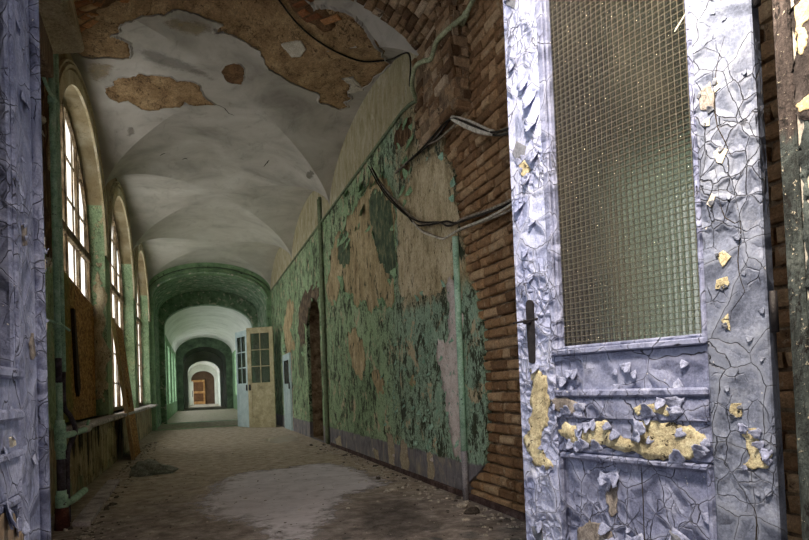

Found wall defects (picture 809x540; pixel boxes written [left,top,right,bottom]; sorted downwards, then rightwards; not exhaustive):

spalling [71,0,392,112]
spalling [696,77,721,127]
crack [714,36,733,158]
flaking render [282,0,539,513]
spalling [715,250,731,267]
crack [715,170,745,323]
flaking render [758,0,802,540]
peeling [549,369,621,452]
peeling [667,438,711,468]
spalling [728,403,773,466]
peeling [0,497,31,540]
peeling [577,467,644,540]